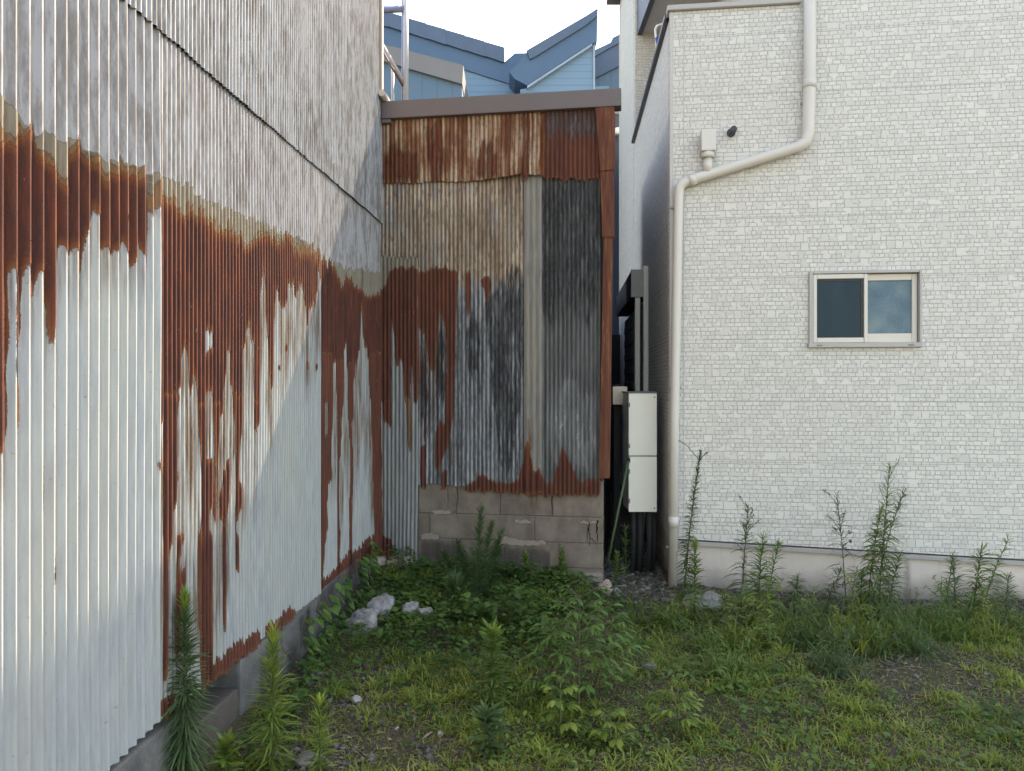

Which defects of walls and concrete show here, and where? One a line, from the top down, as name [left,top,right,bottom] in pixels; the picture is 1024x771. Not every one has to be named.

rust [383,118,443,183]
rust [477,140,496,177]
rust [521,109,601,182]
rust [0,127,148,454]
leakage [467,265,524,472]
rust [157,185,491,721]
rust [465,436,600,499]